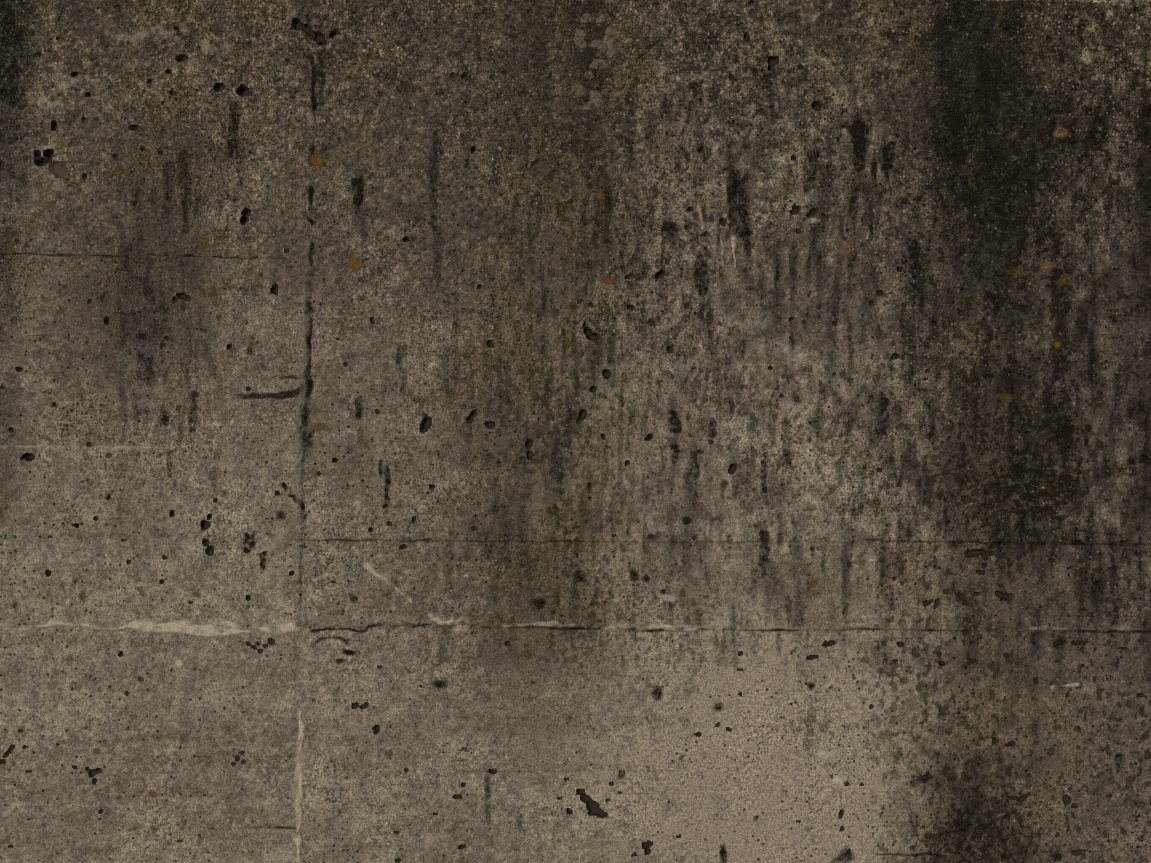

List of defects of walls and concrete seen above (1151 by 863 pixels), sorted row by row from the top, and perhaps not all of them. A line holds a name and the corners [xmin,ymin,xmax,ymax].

crack [310,58,318,108]
leakage [804,150,821,193]
crack [306,188,314,263]
leakage [728,170,752,269]
leakage [693,253,710,295]
leakage [849,0,1091,569]
leakage [669,410,700,478]
crack [288,495,306,519]
leakage [758,521,781,569]
crack [413,622,517,630]
crack [548,625,703,633]
leakage [916,748,1036,863]